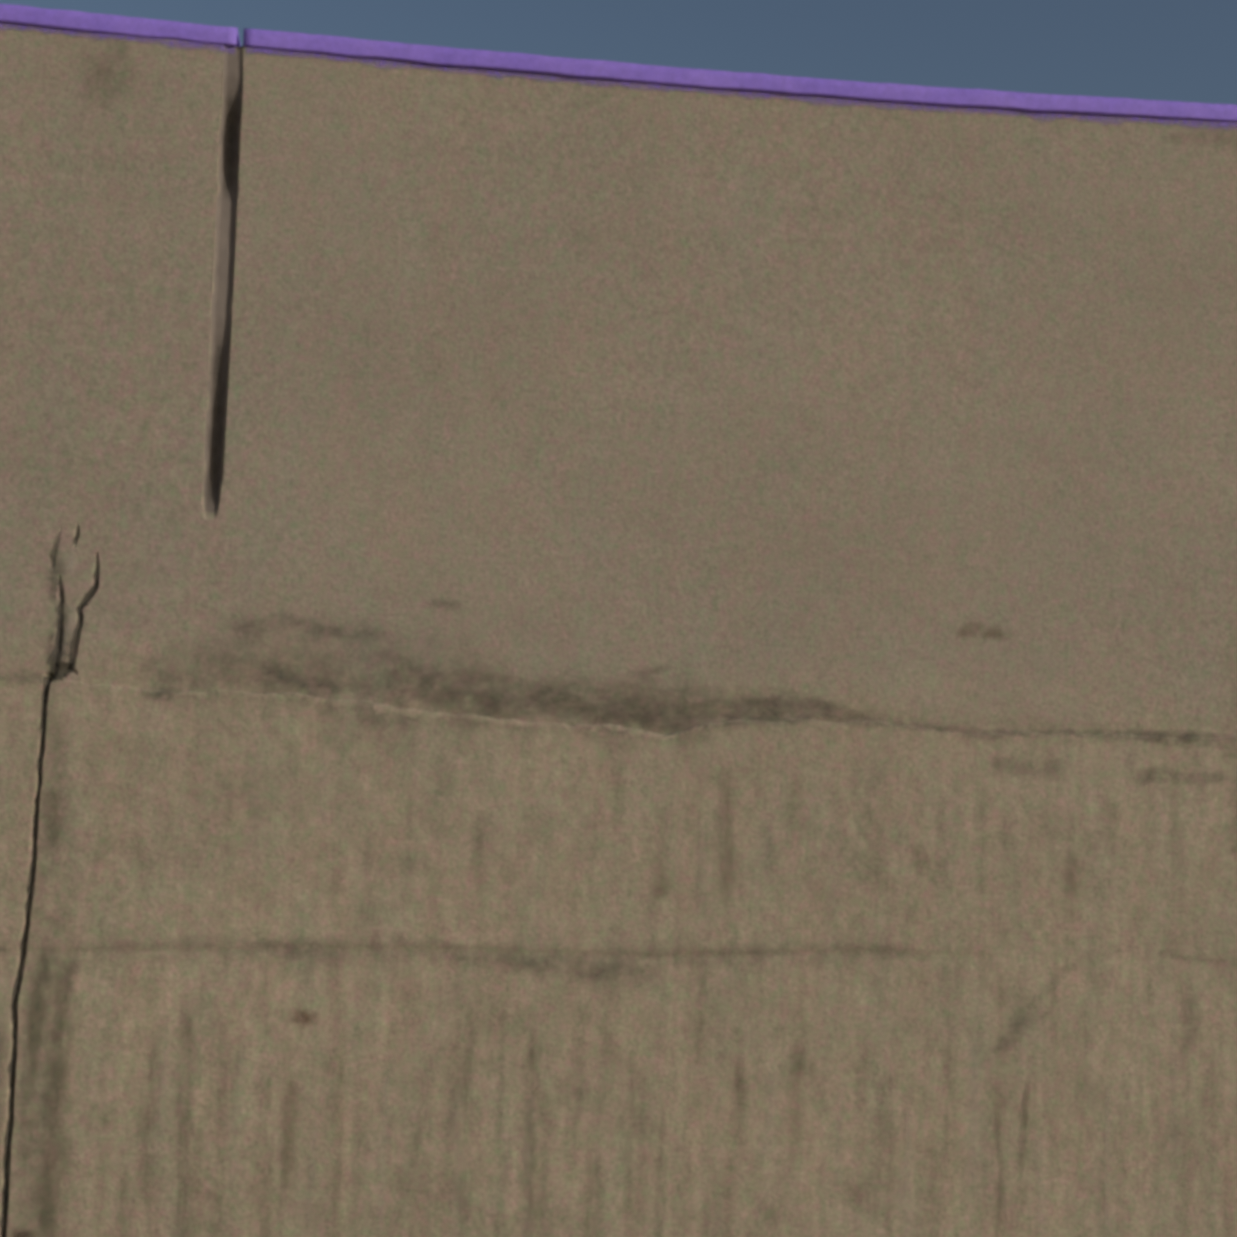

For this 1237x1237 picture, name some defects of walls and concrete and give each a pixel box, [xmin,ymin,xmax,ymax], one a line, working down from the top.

crack [0,570,99,1237]